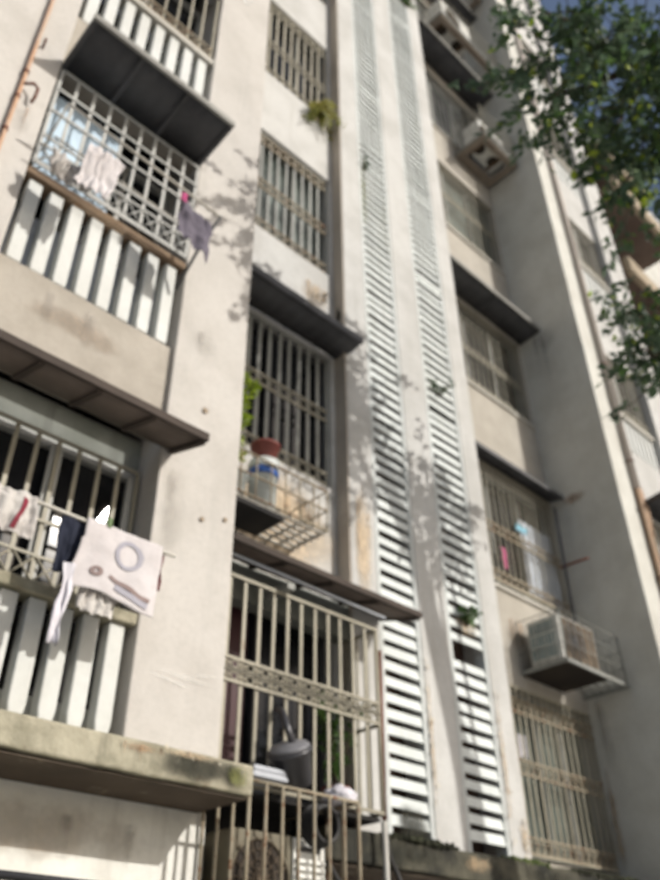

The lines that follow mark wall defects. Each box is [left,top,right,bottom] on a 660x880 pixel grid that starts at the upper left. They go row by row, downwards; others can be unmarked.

damp [170,755,237,783]
damp [390,811,429,862]